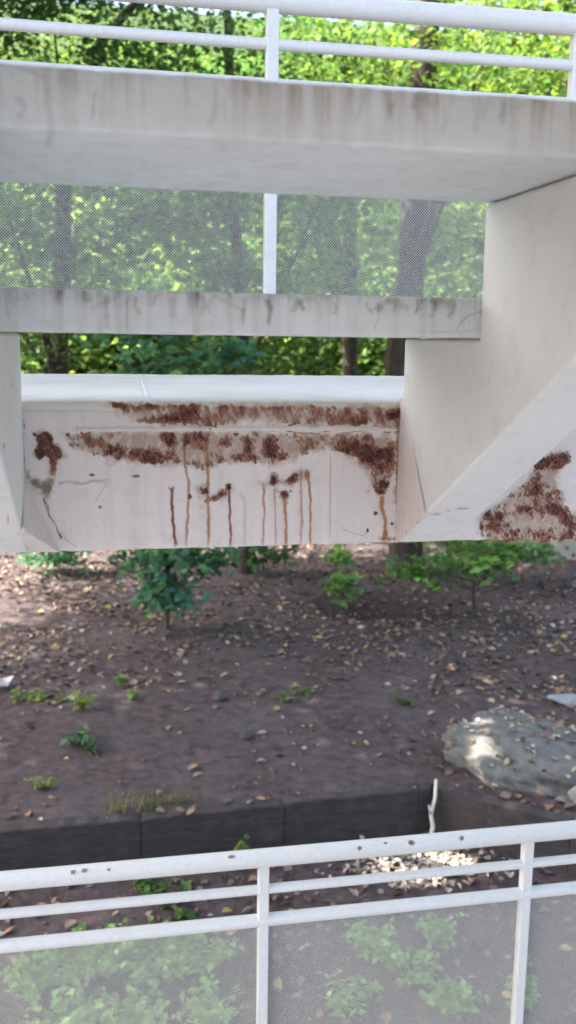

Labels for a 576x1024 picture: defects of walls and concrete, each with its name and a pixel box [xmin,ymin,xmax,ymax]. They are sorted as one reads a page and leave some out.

corrosion [33,431,62,471]
crack [44,498,62,539]
corrosion [170,440,232,545]
corrosion [262,470,312,544]
corrosion [373,497,393,540]